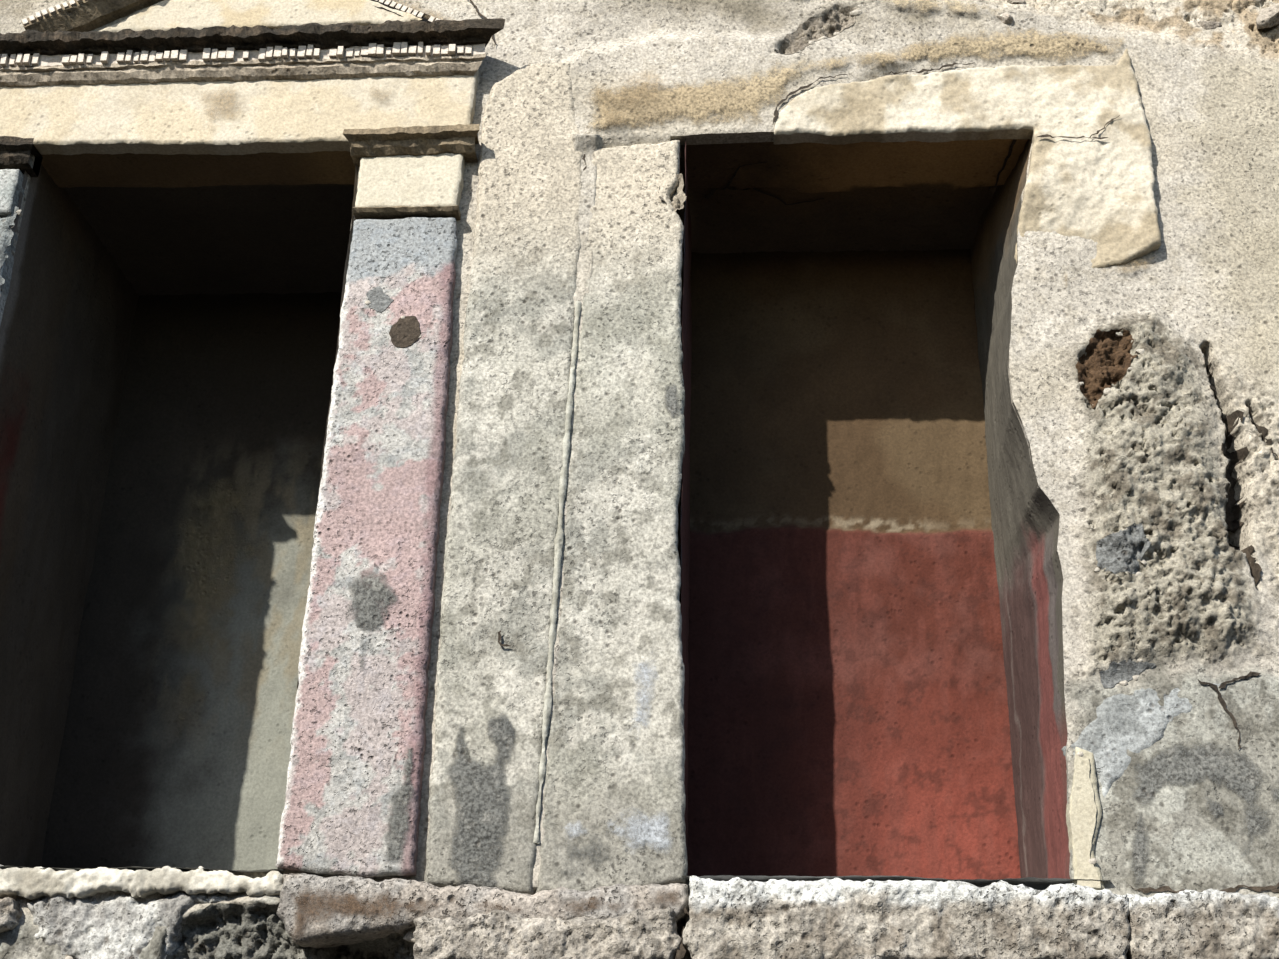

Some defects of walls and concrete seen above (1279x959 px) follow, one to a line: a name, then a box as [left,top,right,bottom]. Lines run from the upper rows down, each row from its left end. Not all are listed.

crack [469,0,496,47]
spalling [774,4,863,55]
spalling [365,286,393,312]
spalling [389,316,421,347]
spalling [1075,328,1144,408]
crack [1204,356,1278,585]
damp [350,571,396,629]
damp [447,715,513,888]